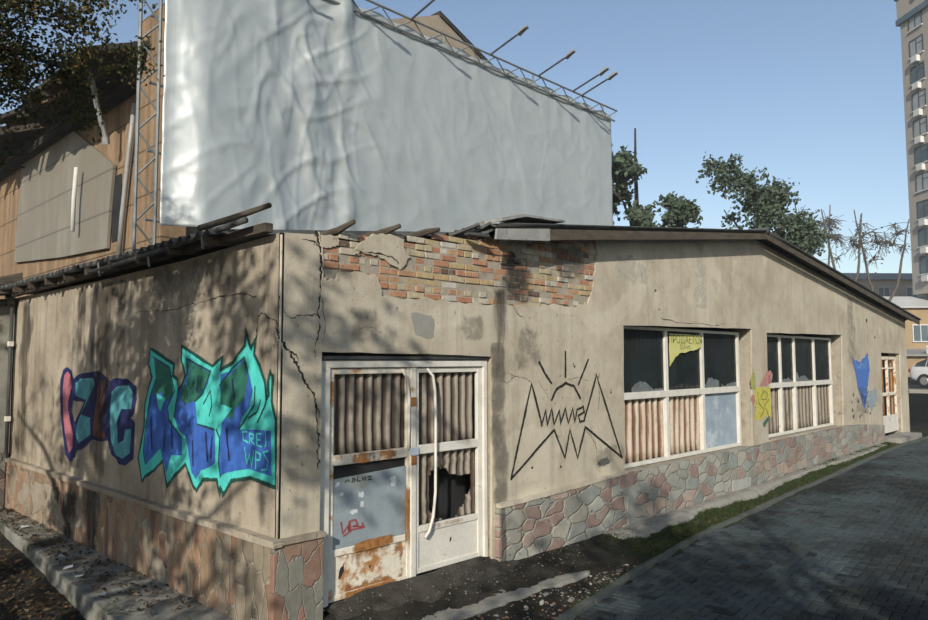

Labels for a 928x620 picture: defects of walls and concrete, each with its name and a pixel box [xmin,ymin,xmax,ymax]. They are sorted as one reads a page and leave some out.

flaking render [320,233,599,306]
damp [18,305,31,441]
damp [91,283,123,466]
crack [136,230,325,471]
damp [86,491,96,550]
corrosion [345,488,410,599]